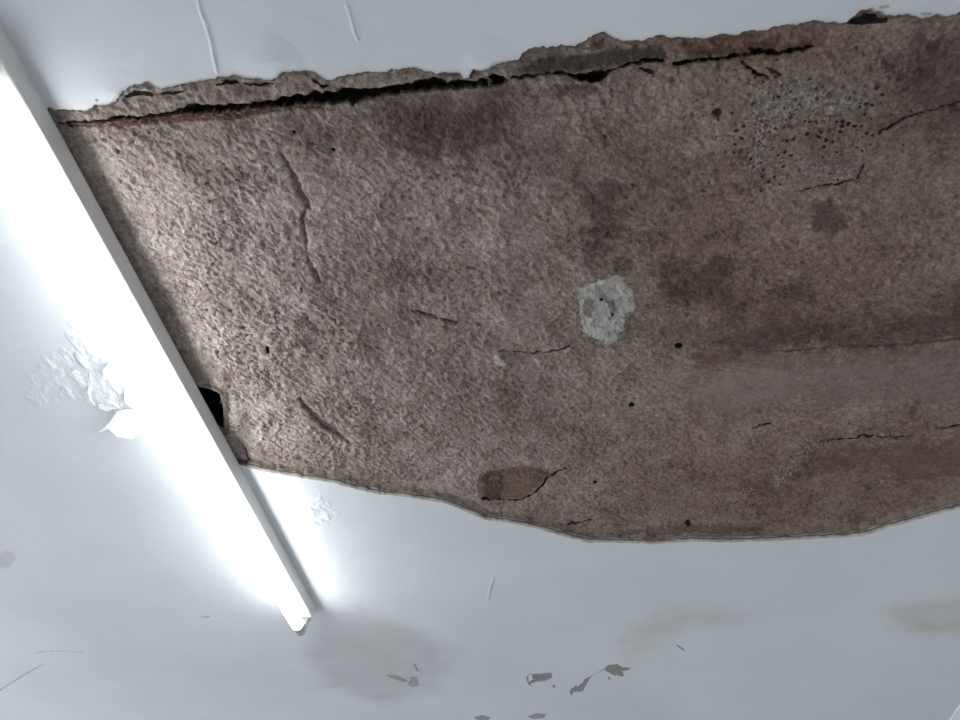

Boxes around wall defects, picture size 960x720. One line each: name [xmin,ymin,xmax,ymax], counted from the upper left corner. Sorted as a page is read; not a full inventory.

crack [58,0,813,128]
crack [879,100,960,132]
crack [803,164,864,191]
flaking render [47,8,960,544]
crack [481,467,567,501]
peeling [526,673,556,687]
peeling [570,676,591,695]
peeling [603,664,630,679]